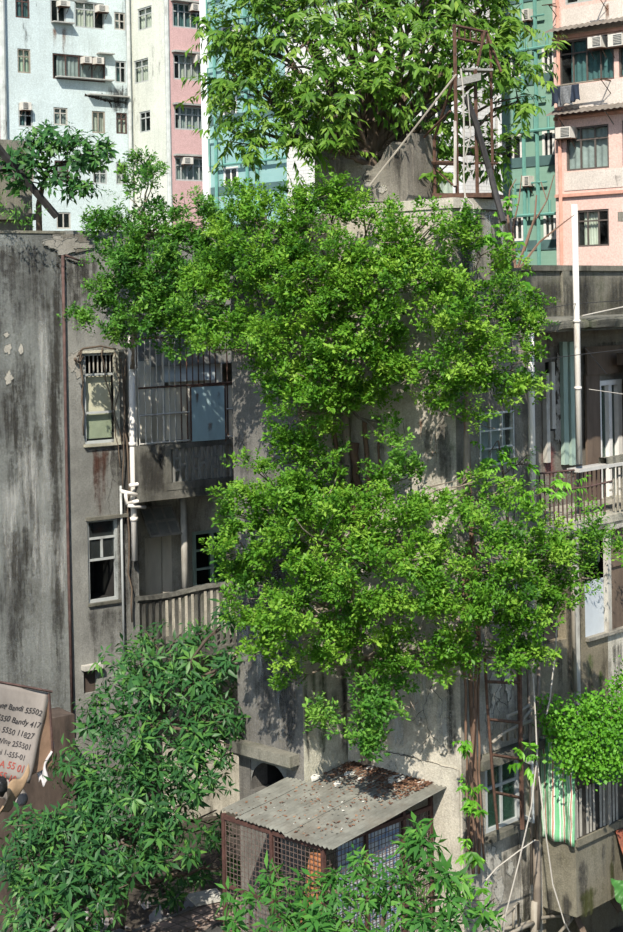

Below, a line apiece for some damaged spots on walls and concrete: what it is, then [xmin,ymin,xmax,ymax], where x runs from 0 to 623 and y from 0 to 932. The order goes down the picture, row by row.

flaking render [42,235,95,255]
flaking render [3,331,24,355]
water stain [4,259,96,638]
rust [94,450,108,484]
crack [377,678,456,770]